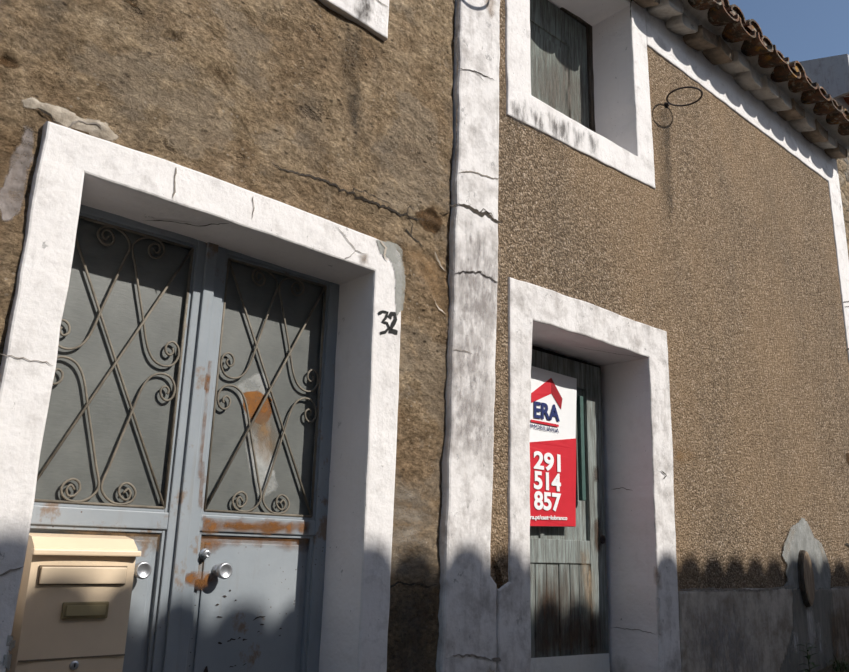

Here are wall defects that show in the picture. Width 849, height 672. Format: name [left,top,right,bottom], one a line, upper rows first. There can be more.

peeling [22,97,118,140]
peeling [0,129,33,220]
crack [269,160,434,247]
spalling [416,206,442,234]
crack [449,203,502,223]
peeling [376,240,406,315]
crack [436,262,499,284]
corrosion [243,391,272,447]
corrosion [200,518,308,548]
corrosion [185,573,215,585]
spalling [492,557,504,589]
crack [452,654,501,662]